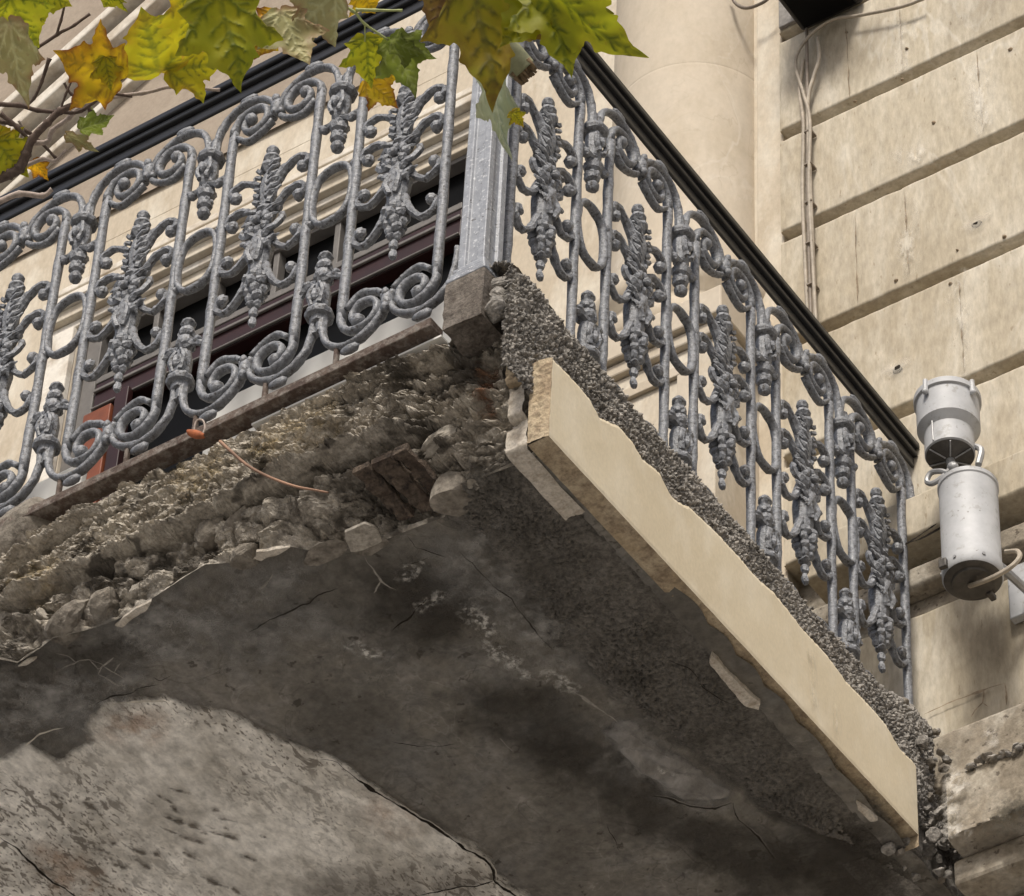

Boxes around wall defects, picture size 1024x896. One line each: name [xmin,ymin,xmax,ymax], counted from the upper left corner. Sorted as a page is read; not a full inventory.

leakage [0,602,230,737]
crack [249,588,338,632]
crack [406,537,553,650]
spalling [0,260,964,896]
leakage [368,542,897,896]
spalling [964,742,1024,771]
crack [2,839,75,896]
crack [323,758,519,896]